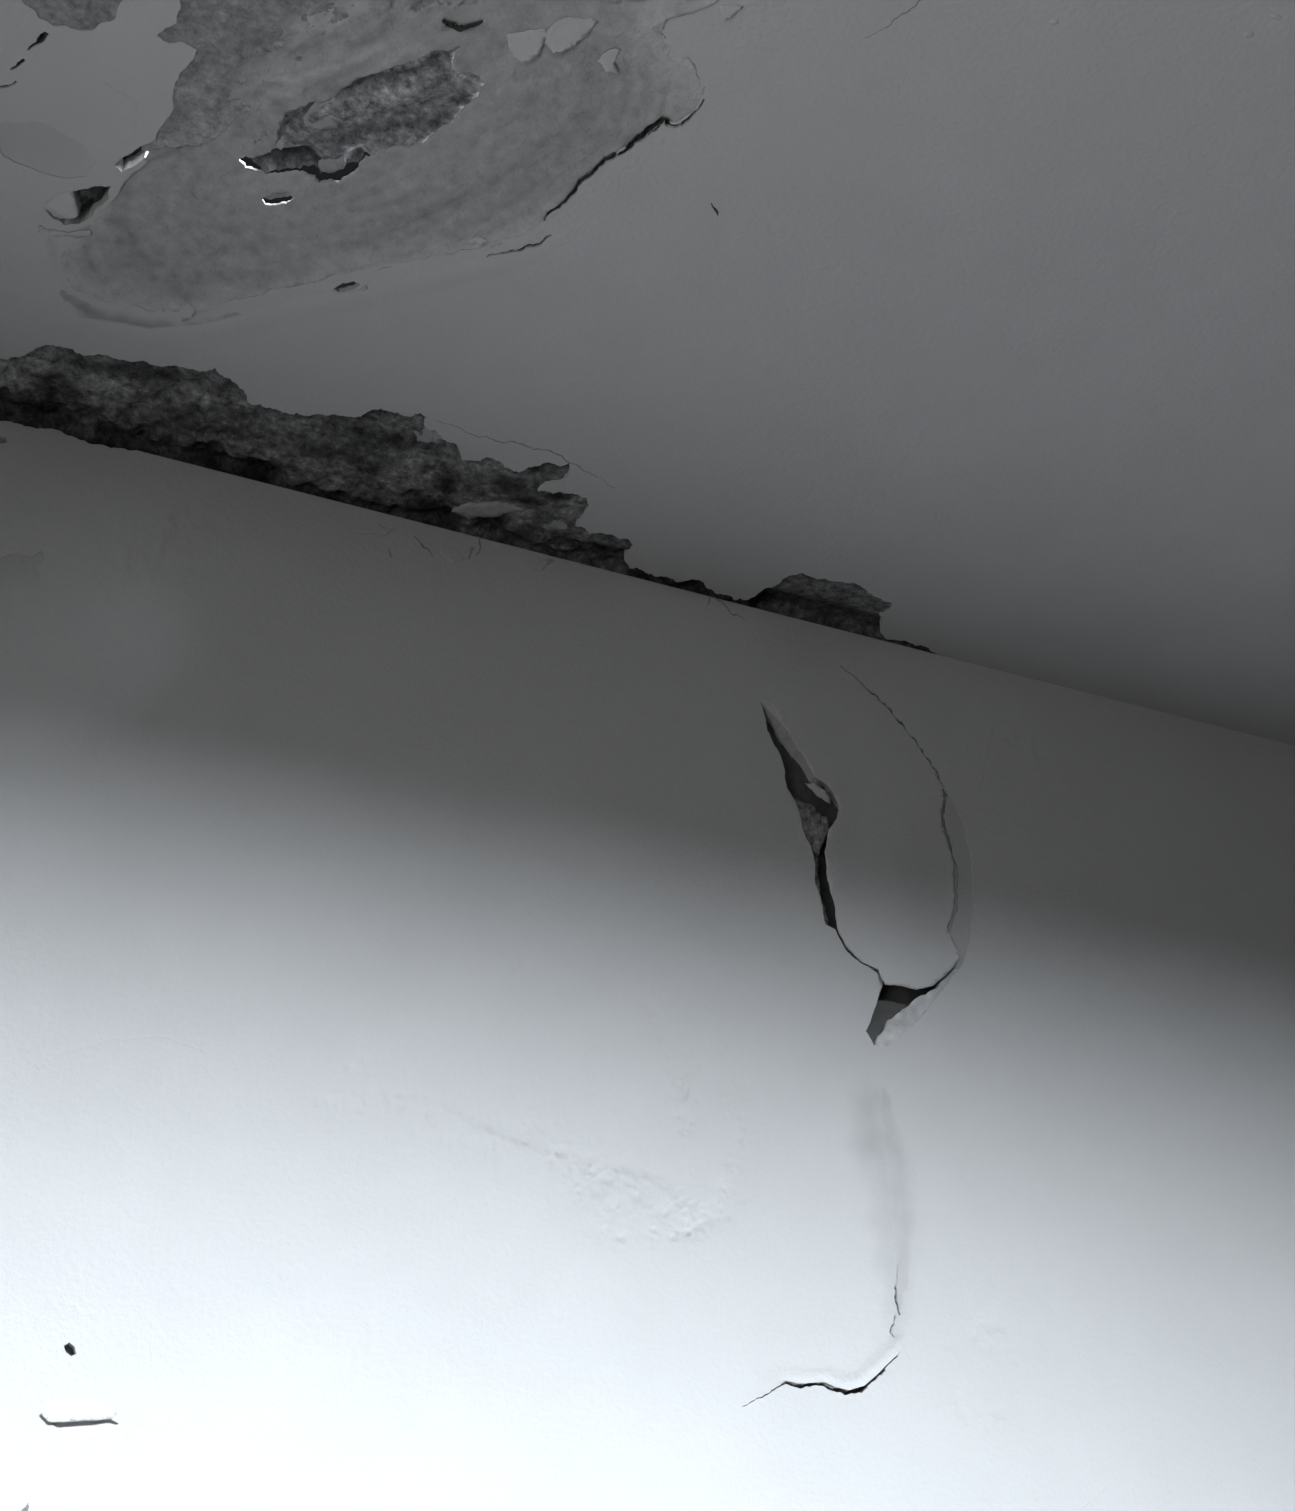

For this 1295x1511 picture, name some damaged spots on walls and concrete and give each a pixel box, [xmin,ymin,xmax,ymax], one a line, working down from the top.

spalling [23,0,122,30]
peeling [38,0,743,321]
spalling [0,345,935,654]
flaking render [766,670,973,1048]
crack [742,1288,897,1407]